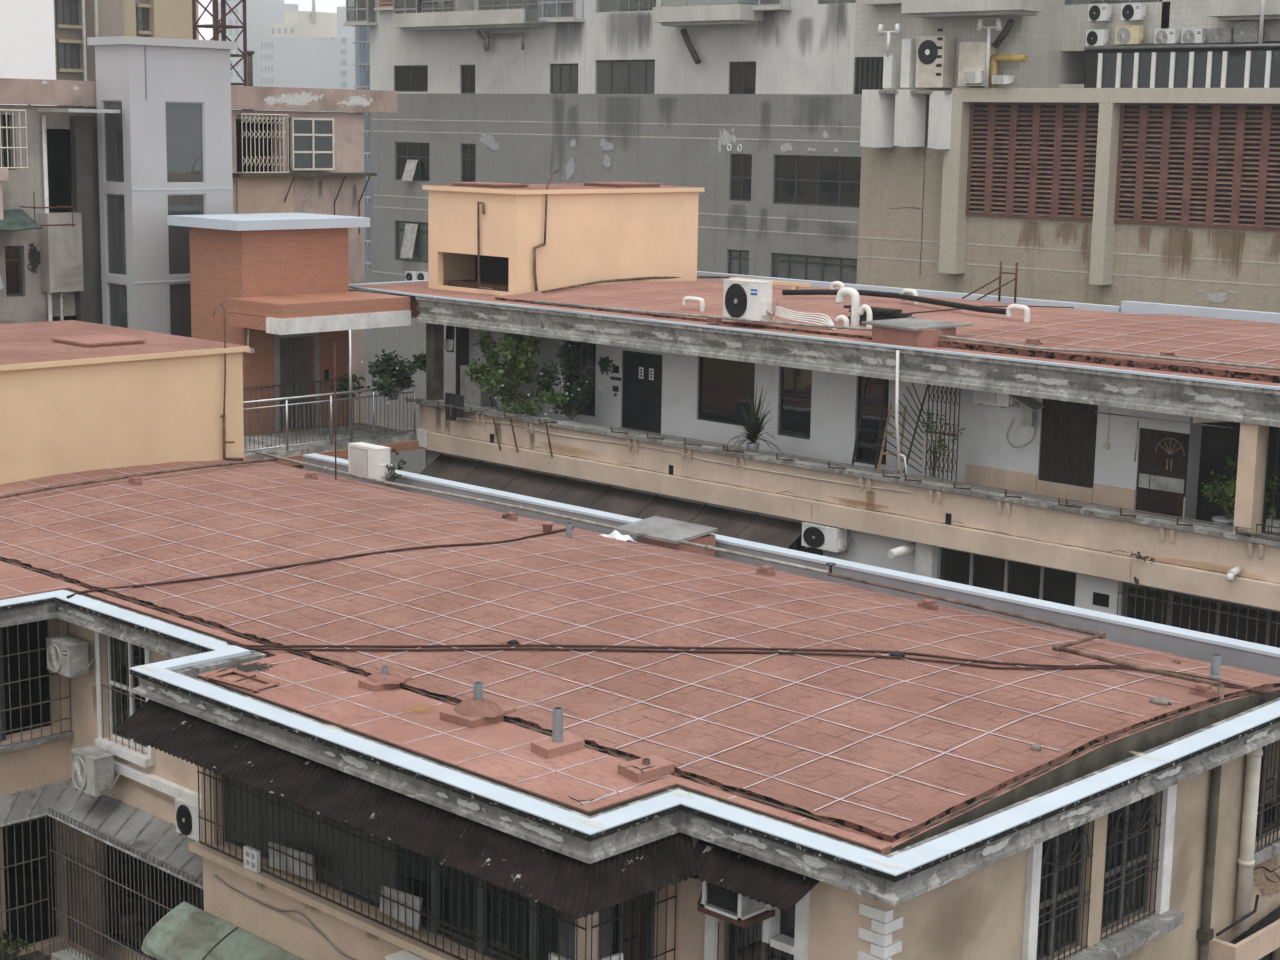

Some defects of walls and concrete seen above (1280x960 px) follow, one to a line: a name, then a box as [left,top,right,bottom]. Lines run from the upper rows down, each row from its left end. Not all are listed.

spalling [416,297,1143,395]
spalling [938,341,1280,383]
crack [0,558,369,676]
spalling [0,556,371,677]
crack [400,685,459,704]
spalling [400,683,463,703]
spalling [504,716,552,735]
crack [505,719,552,735]
spalling [583,739,641,759]
spalling [674,683,1280,842]
crack [585,744,853,829]
peeling [710,826,831,869]